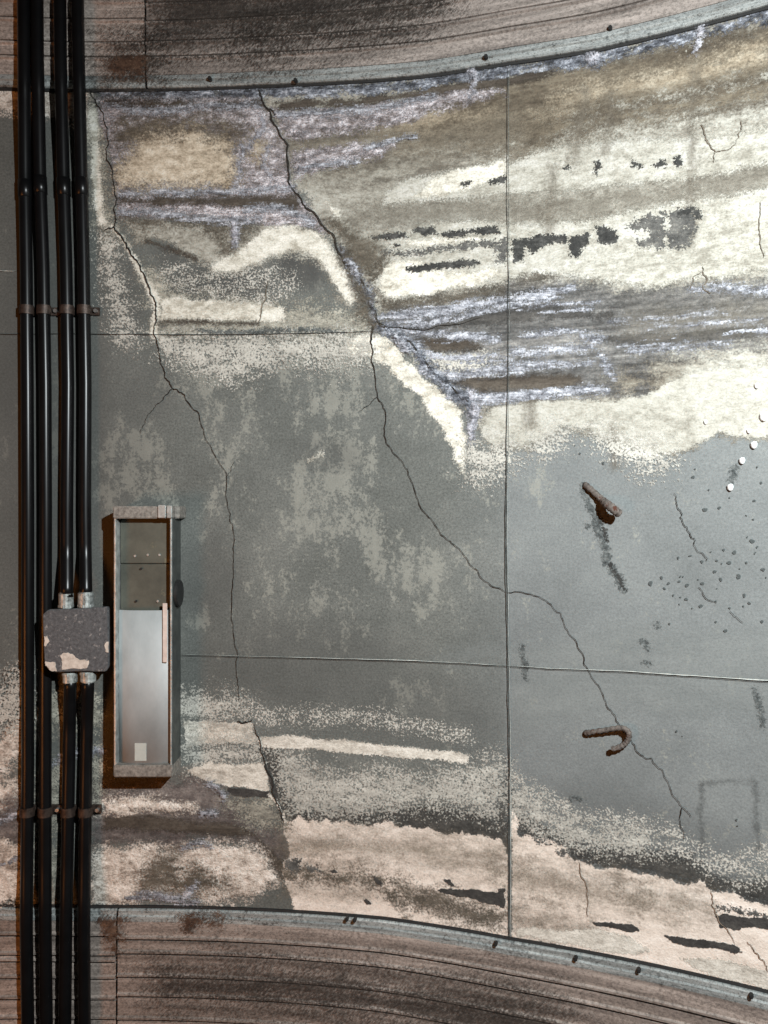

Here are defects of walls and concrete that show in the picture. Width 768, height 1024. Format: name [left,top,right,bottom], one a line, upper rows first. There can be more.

leakage [0,91,18,121]
leakage [45,0,768,497]
crack [90,92,239,694]
crack [258,90,691,831]
crack [674,493,707,561]
crack [237,720,284,821]
leakage [52,675,768,908]